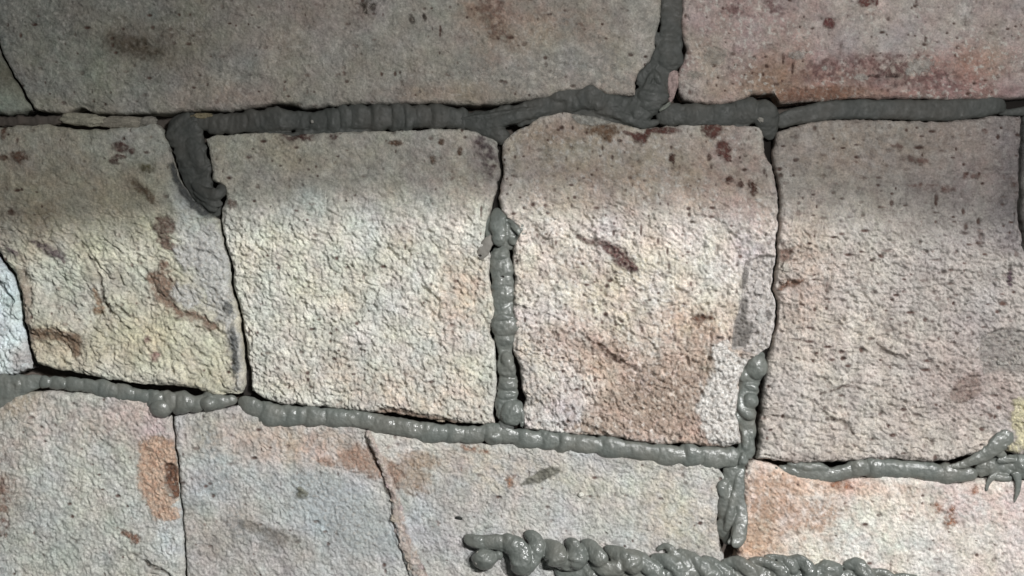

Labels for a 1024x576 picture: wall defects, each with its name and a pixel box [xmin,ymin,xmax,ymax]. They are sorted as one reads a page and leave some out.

crack [0,45,37,112]
crack [133,414,187,576]
crack [366,430,428,576]